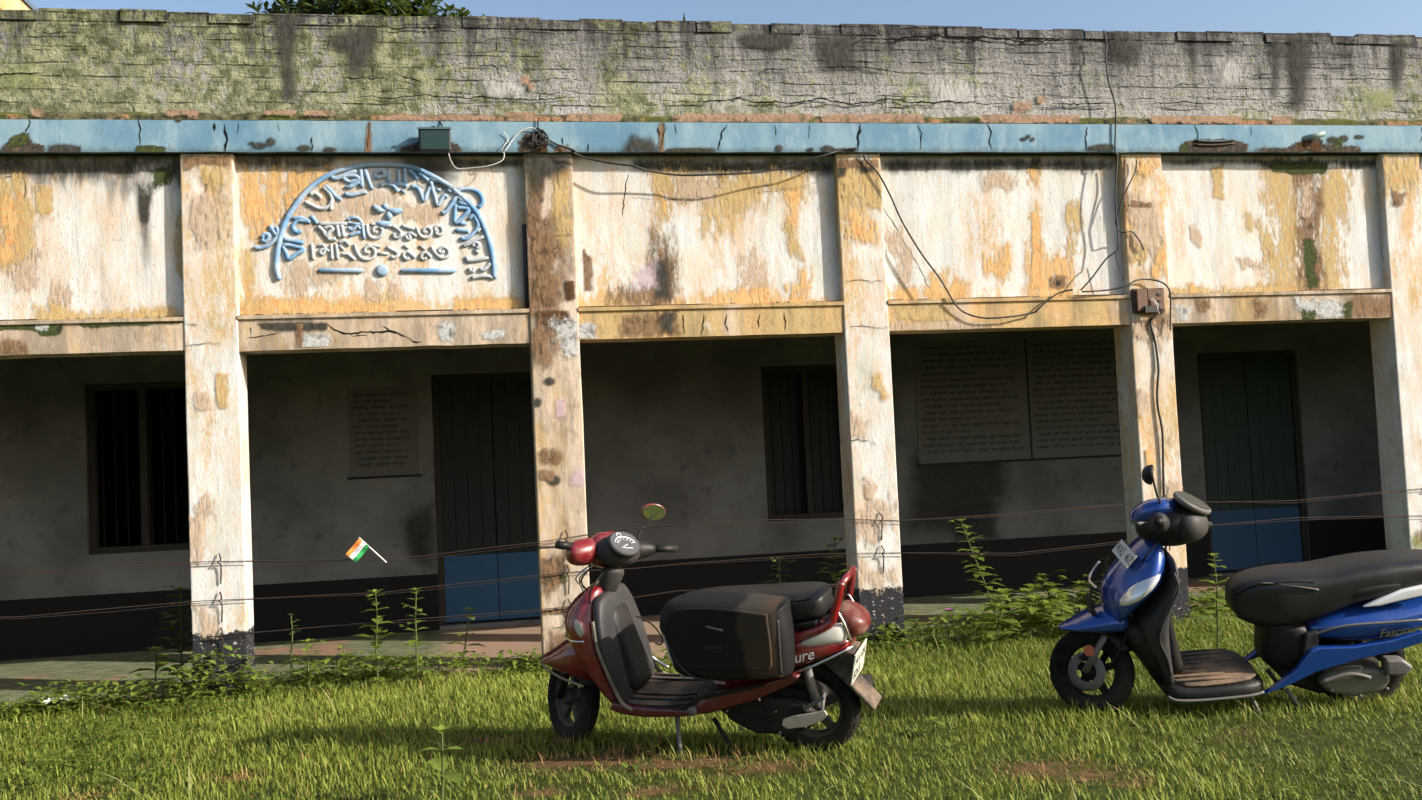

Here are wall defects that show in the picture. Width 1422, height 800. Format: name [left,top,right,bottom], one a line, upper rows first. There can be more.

damp [932,81,973,106]
damp [1273,38,1309,107]
damp [1392,42,1407,88]
spalling [0,132,81,152]
damp [0,157,181,239]
peeling [0,171,184,331]
peeling [174,155,445,315]
peeling [663,161,826,304]
peeling [837,157,1084,300]
spalling [1151,115,1362,200]
damp [1162,135,1393,319]
crack [328,324,451,343]